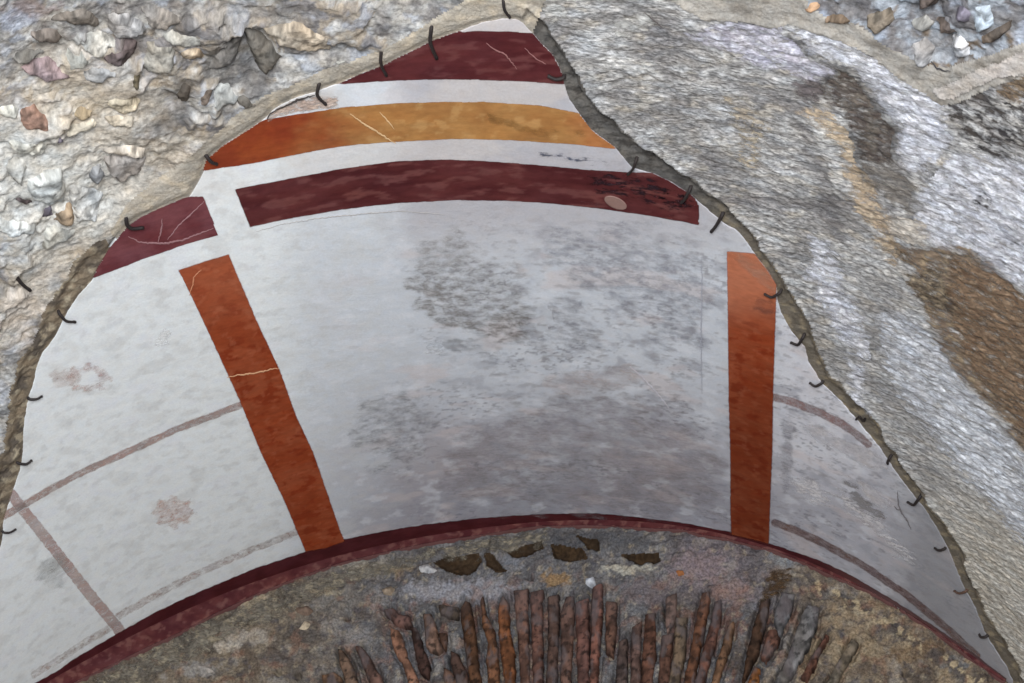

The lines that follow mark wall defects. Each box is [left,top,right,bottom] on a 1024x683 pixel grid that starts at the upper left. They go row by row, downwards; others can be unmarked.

crack [487,43,545,69]
crack [350,113,396,144]
peeling [593,173,692,210]
crack [128,201,213,244]
crack [227,368,277,378]
spalling [433,535,600,576]
spalling [621,553,661,565]